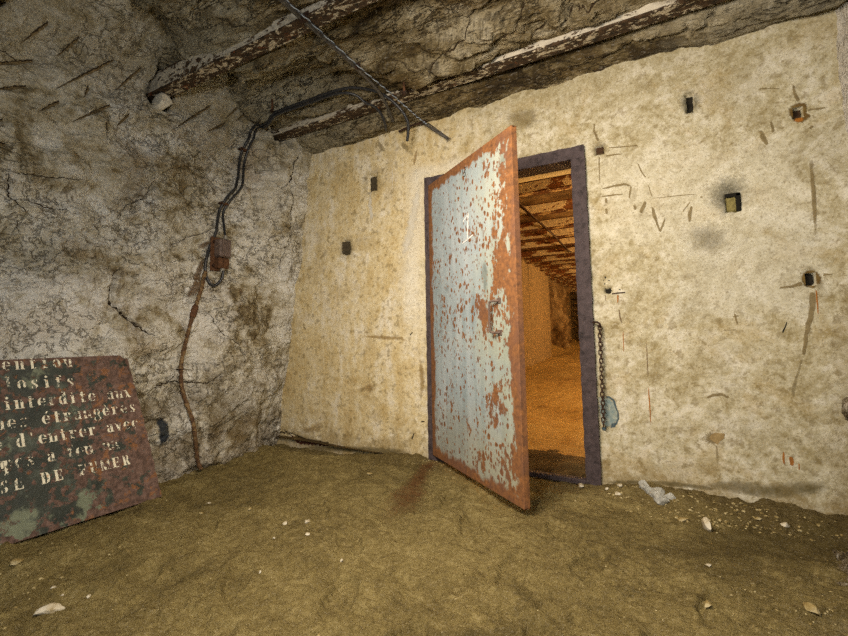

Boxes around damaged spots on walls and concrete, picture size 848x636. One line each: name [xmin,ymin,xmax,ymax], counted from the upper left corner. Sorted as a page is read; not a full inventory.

crack [108,269,155,336]